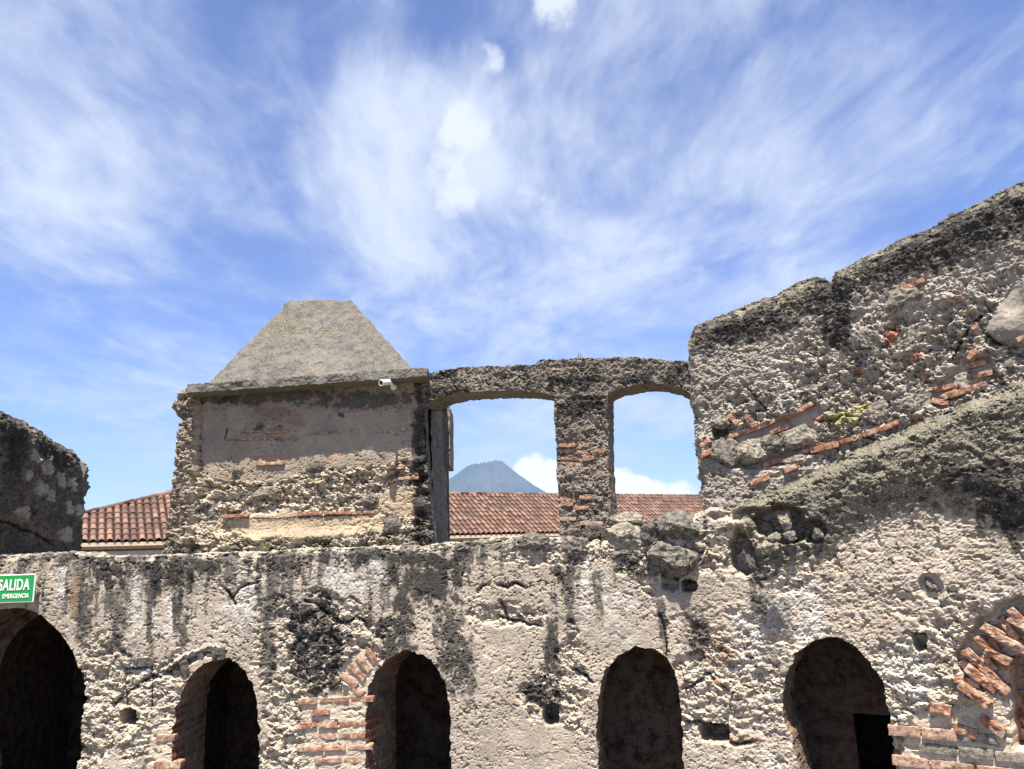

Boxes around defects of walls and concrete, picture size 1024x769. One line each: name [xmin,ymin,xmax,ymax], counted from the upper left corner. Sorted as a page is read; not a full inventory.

flaking render [188,386,434,539]
leakage [185,369,477,712]
crack [478,582,542,626]
flaking render [297,645,385,769]
flaking render [888,596,1024,769]